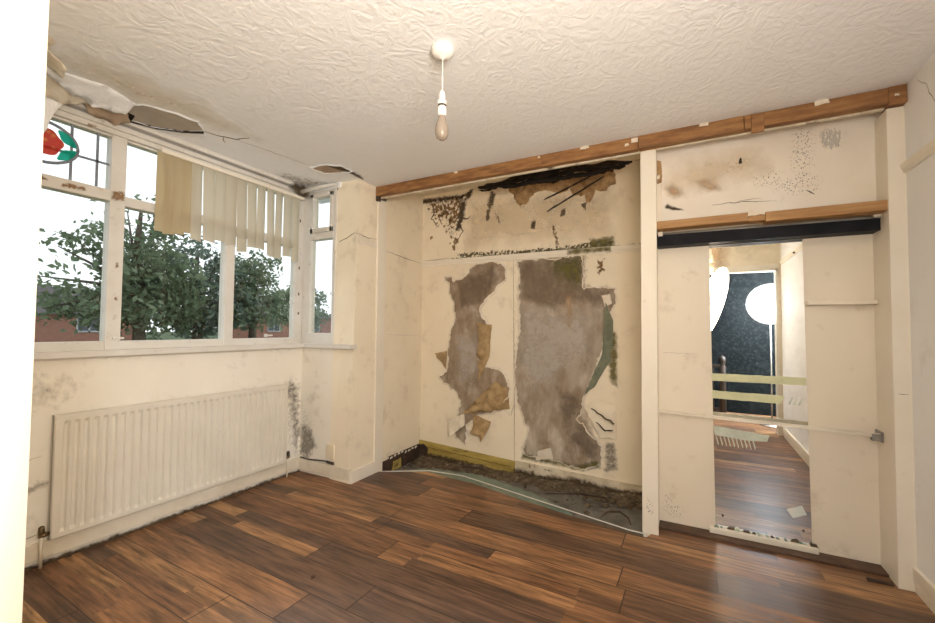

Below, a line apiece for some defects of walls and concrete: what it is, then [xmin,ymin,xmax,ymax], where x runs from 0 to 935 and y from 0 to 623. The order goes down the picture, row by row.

peeling [128,103,207,137]
flaking render [423,189,473,251]
flaking render [509,170,616,210]
flaking render [438,255,618,472]
mould [287,384,314,456]
water stain [24,470,300,572]